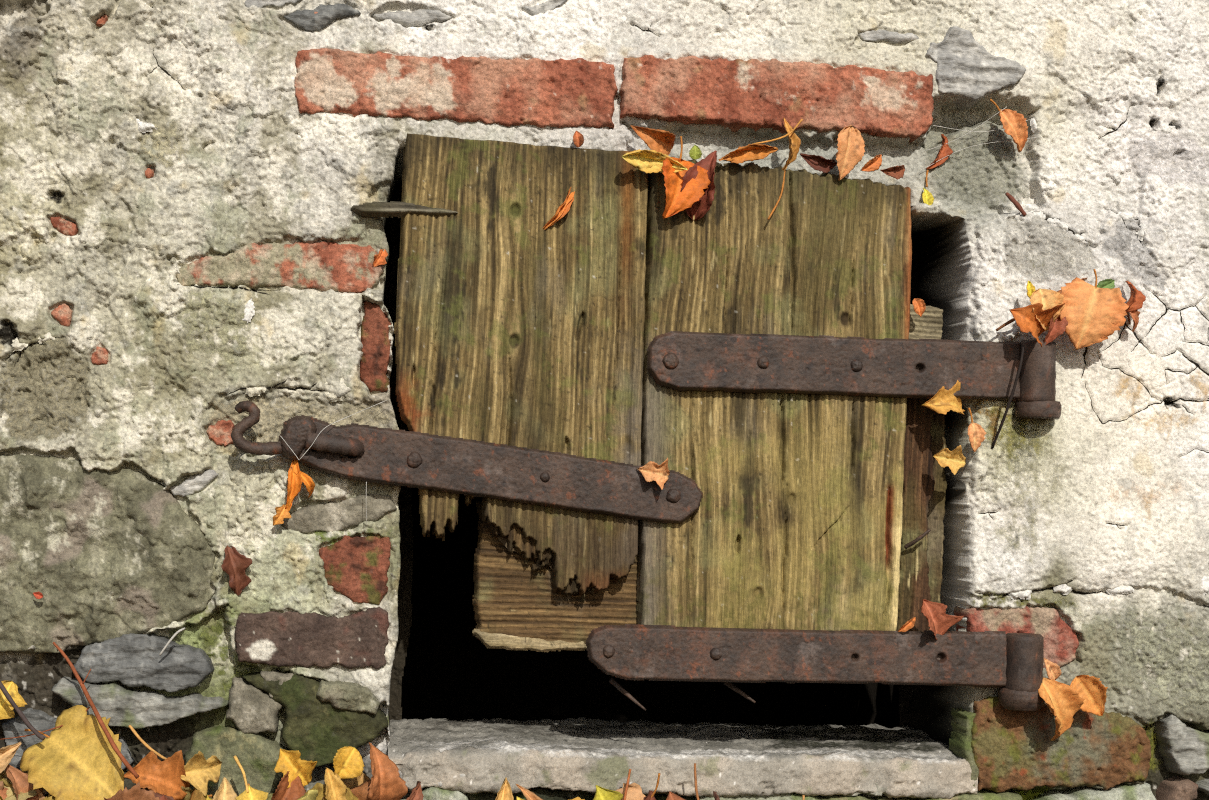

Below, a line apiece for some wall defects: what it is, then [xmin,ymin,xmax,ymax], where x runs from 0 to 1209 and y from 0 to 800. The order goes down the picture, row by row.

spalling [178,291,255,367]
crack [1082,290,1209,424]
crack [979,580,1108,602]